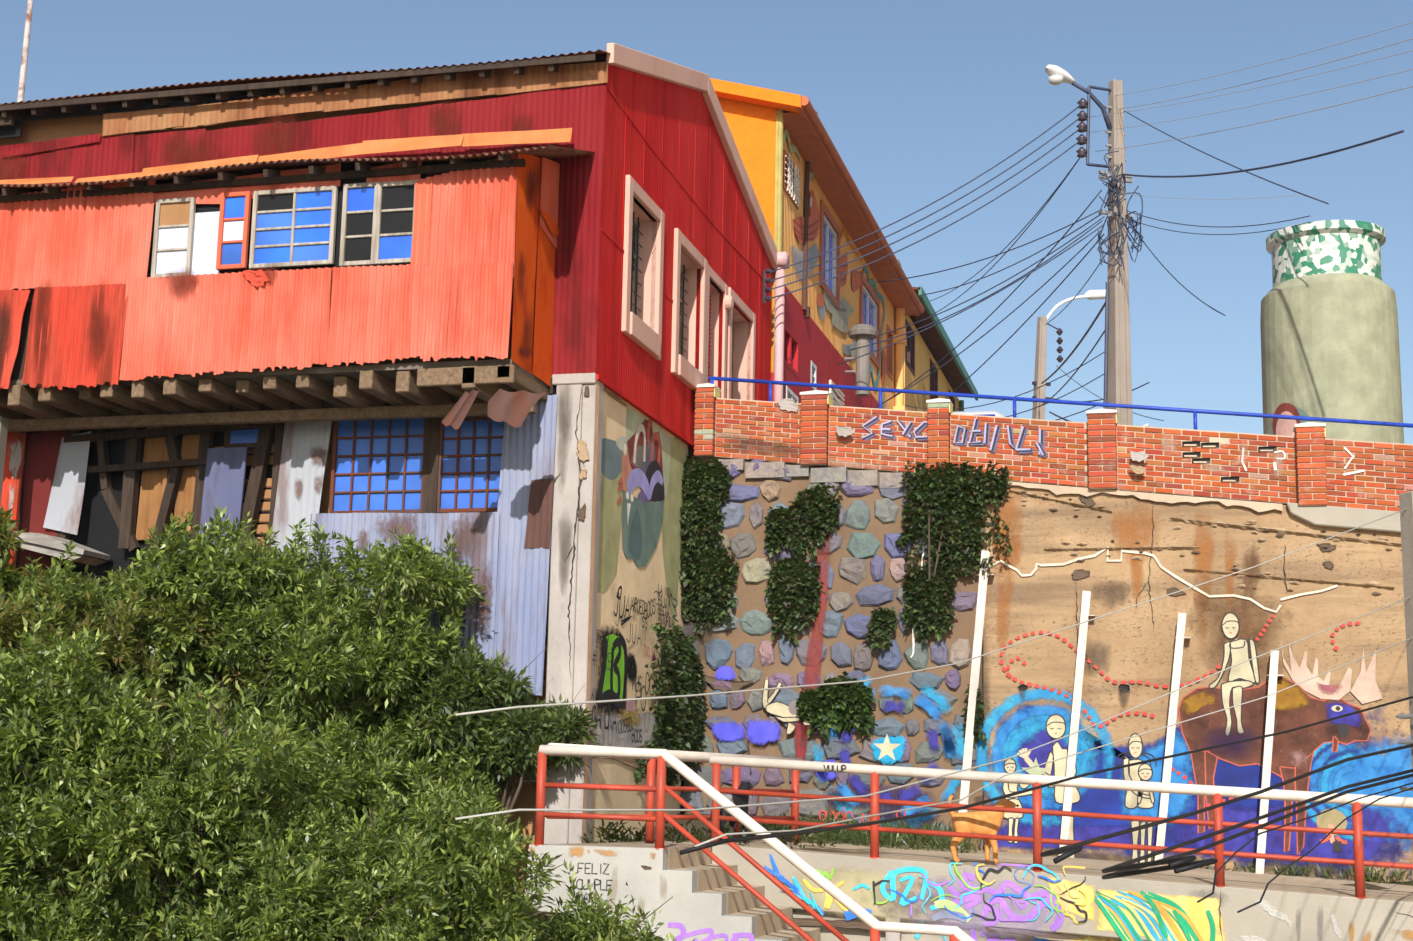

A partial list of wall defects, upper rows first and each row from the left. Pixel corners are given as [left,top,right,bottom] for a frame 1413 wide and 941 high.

damp [1246,554,1257,584]
damp [1204,598,1275,672]